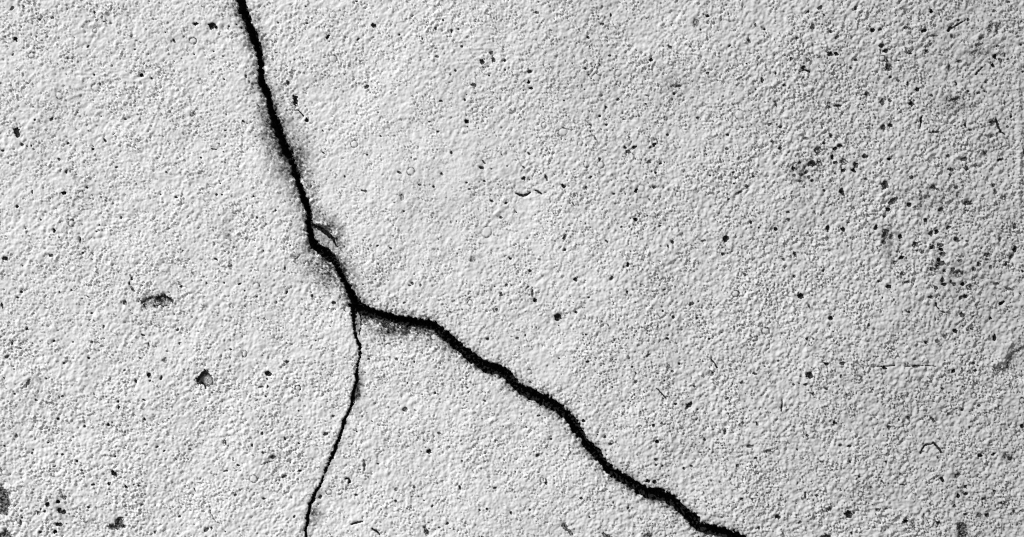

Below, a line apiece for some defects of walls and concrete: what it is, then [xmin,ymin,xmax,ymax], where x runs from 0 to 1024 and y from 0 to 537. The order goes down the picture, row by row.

crack [236,0,746,537]